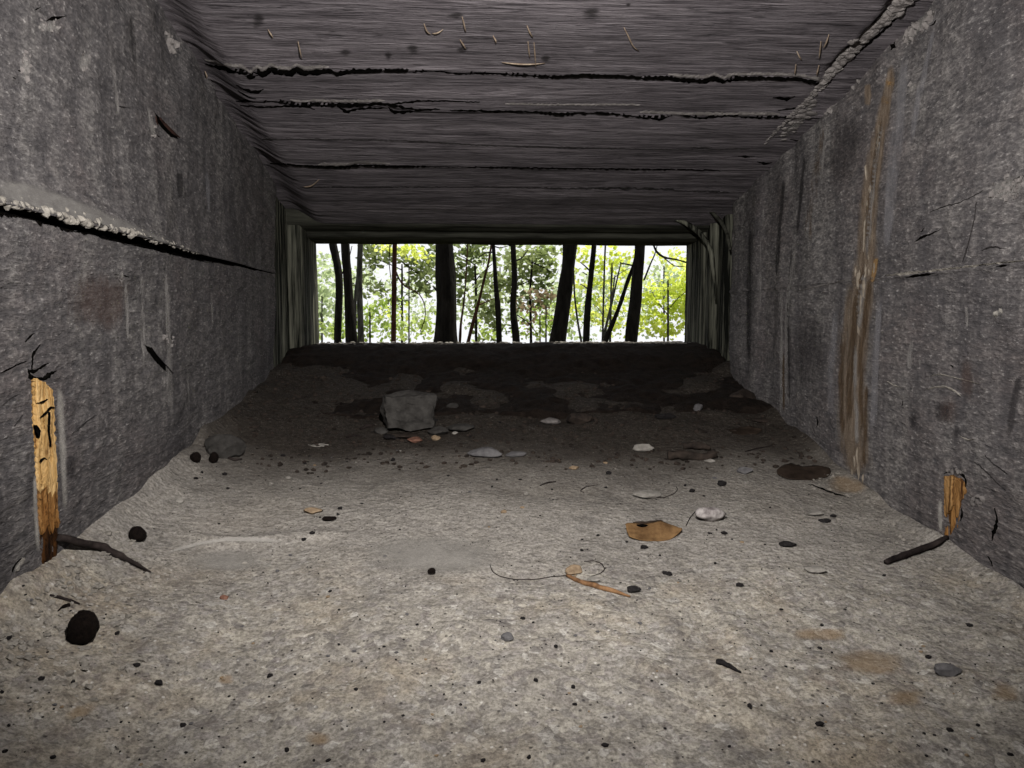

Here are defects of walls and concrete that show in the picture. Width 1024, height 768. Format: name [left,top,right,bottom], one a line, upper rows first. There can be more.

crack [205,59,829,141]
spalling [764,0,936,144]
crack [262,138,772,193]
crack [0,195,271,273]
corrosion [838,69,894,483]
spalling [944,465,985,521]